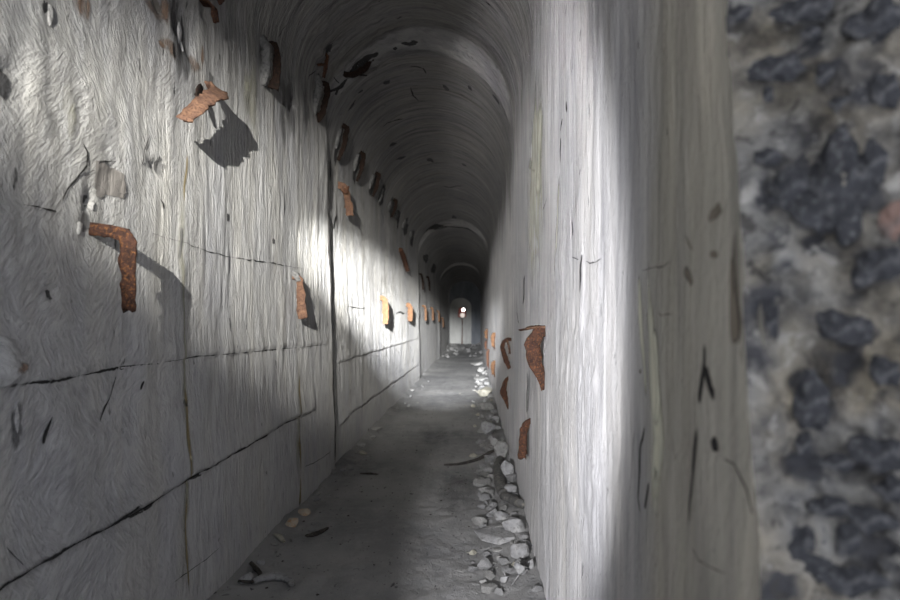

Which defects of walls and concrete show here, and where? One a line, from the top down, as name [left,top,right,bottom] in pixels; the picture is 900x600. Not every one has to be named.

crack [11,345,316,421]
crack [698,346,715,402]
crack [0,412,311,591]
crack [688,430,753,524]